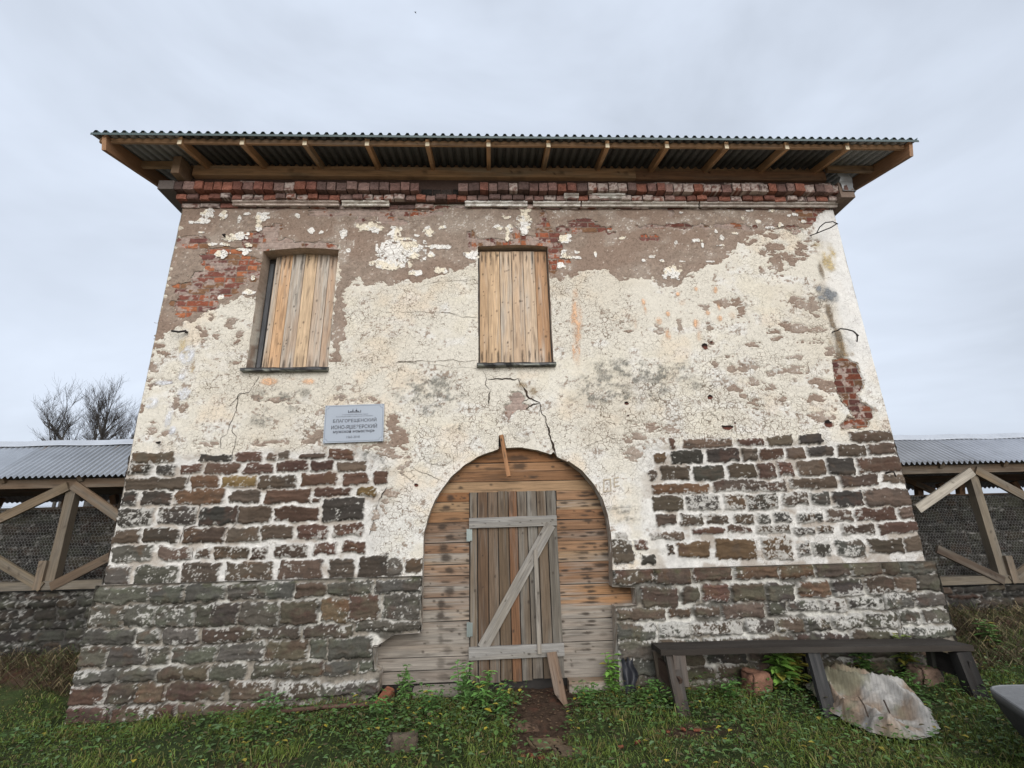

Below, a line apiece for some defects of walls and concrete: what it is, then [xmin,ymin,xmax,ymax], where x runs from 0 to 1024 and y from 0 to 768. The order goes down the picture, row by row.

flaking render [146,189,823,413]
flaking render [139,403,170,438]
crack [220,379,258,455]
flaking render [252,406,325,447]
crack [399,359,557,457]
flaking render [710,292,873,430]